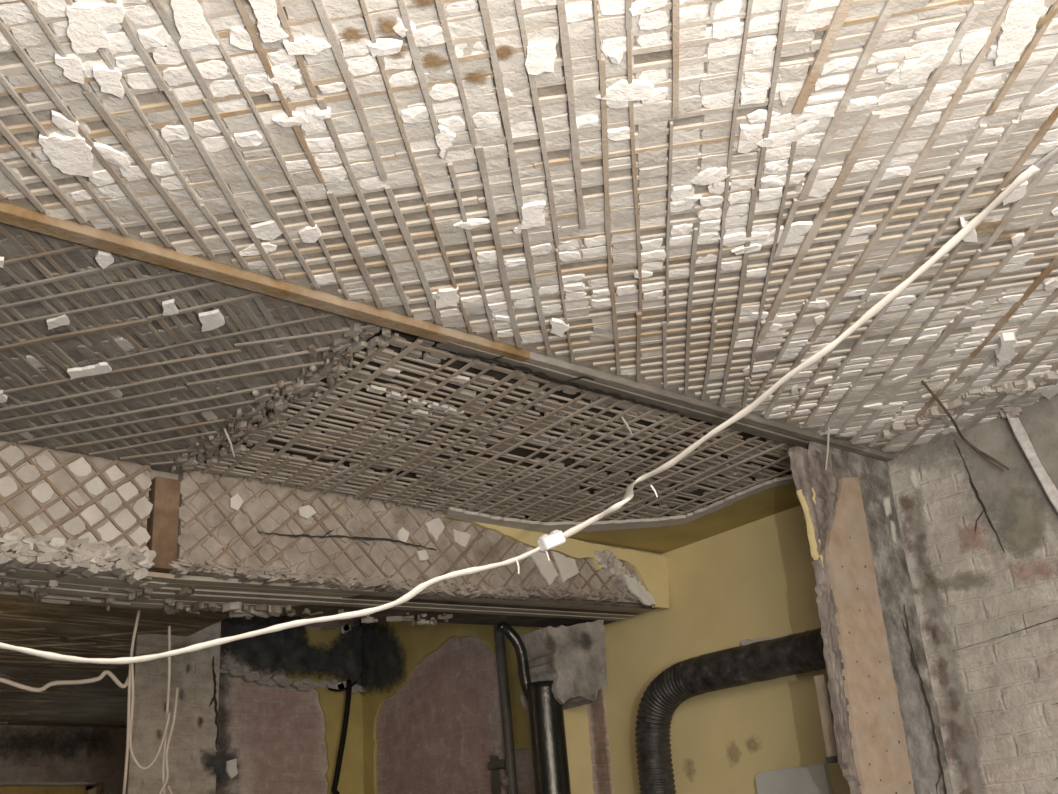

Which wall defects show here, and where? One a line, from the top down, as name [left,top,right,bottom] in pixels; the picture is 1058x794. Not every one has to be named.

flaking render [55,2,125,99]
flaking render [171,0,219,49]
flaking render [248,0,331,55]
flaking render [525,41,557,75]
flaking render [994,0,1045,66]
flaking render [38,132,94,177]
flaking render [518,201,546,229]
flaking render [199,309,225,332]
flaking render [67,362,112,380]
crack [954,440,1005,553]
spalling [416,446,861,794]
crack [954,618,1058,651]